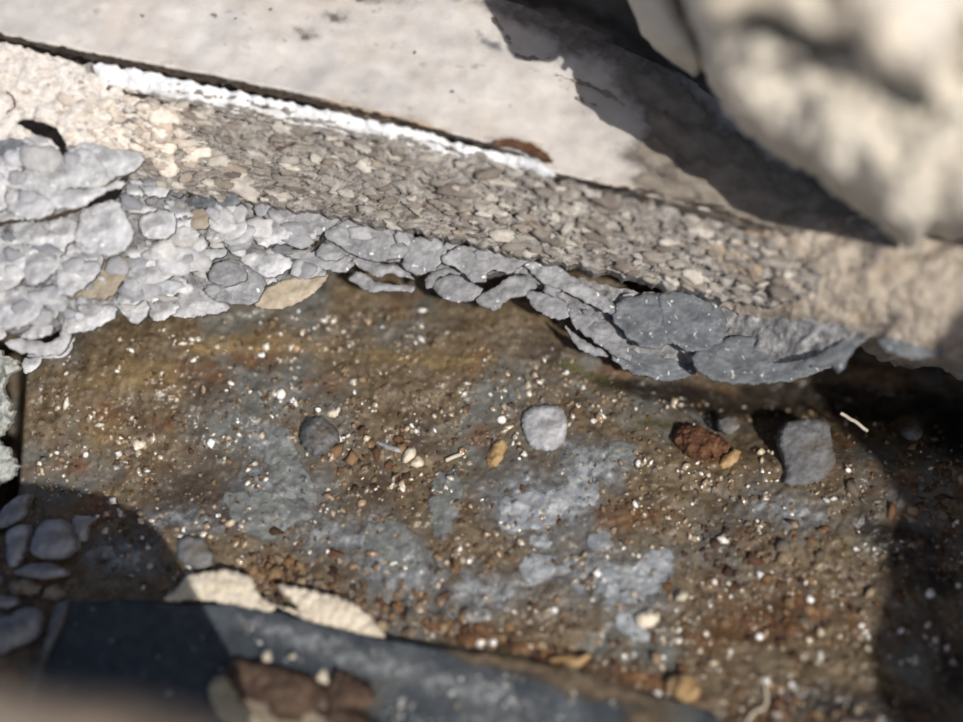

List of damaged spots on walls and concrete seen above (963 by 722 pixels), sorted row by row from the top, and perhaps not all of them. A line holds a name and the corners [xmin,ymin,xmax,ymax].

peeling [0,42,944,485]
peeling [223,427,318,540]
rust [420,618,565,668]
rust [685,594,840,652]